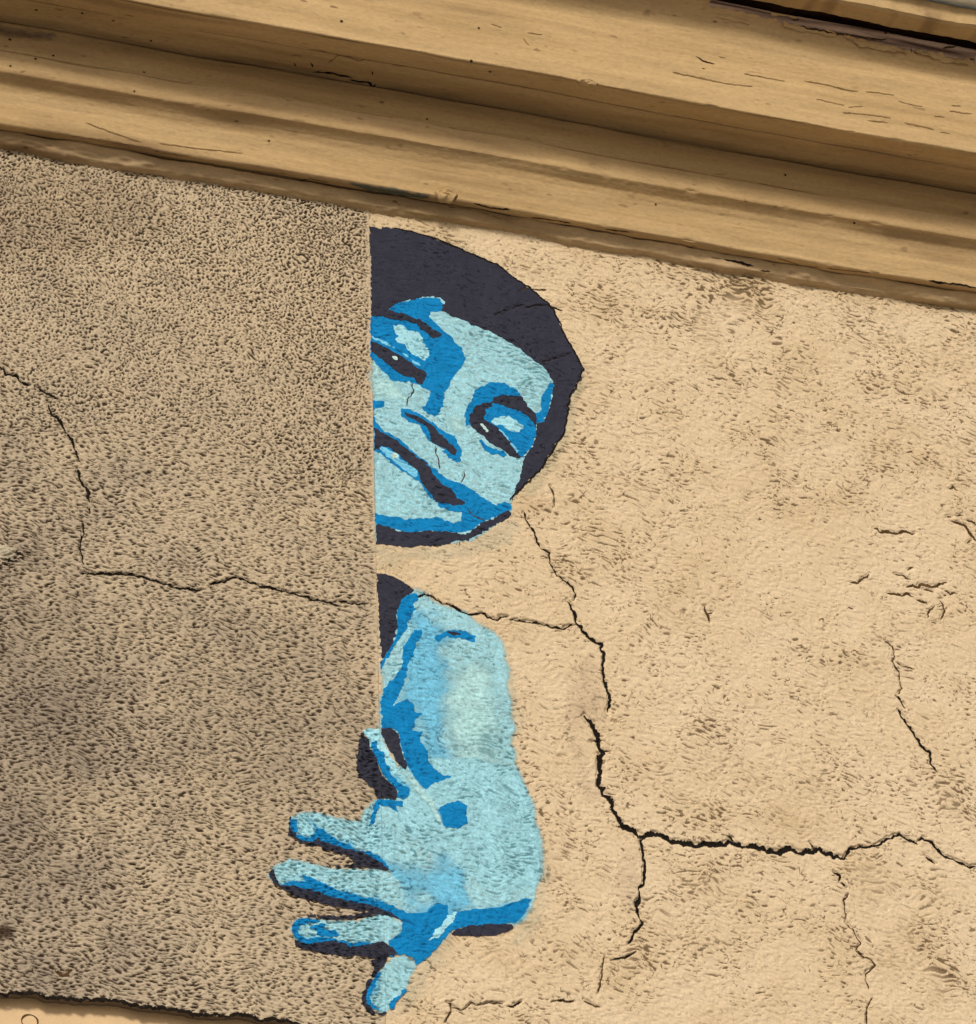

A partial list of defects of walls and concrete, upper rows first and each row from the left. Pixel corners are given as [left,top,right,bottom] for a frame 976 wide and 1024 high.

crack [0,366,367,607]
crack [418,512,976,1024]